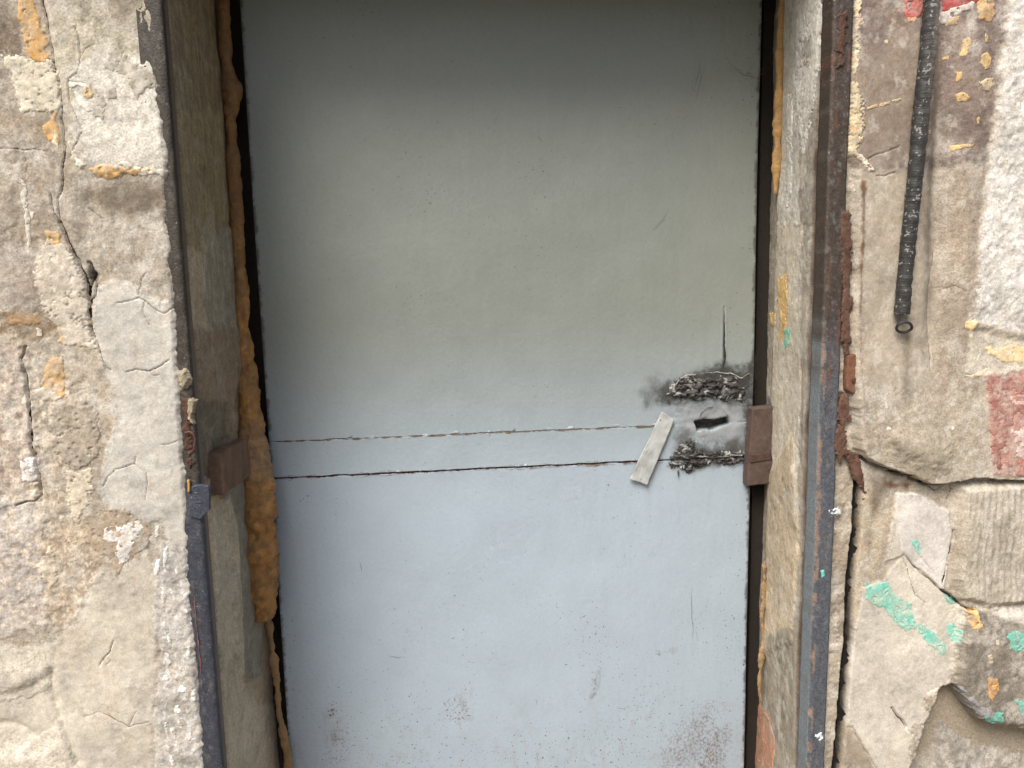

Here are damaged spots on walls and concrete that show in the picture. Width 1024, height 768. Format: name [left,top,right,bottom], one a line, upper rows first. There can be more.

crack [0,0,171,372]
rust [839,181,866,356]
rust [834,391,867,500]
crack [831,454,950,768]
crack [903,531,968,609]